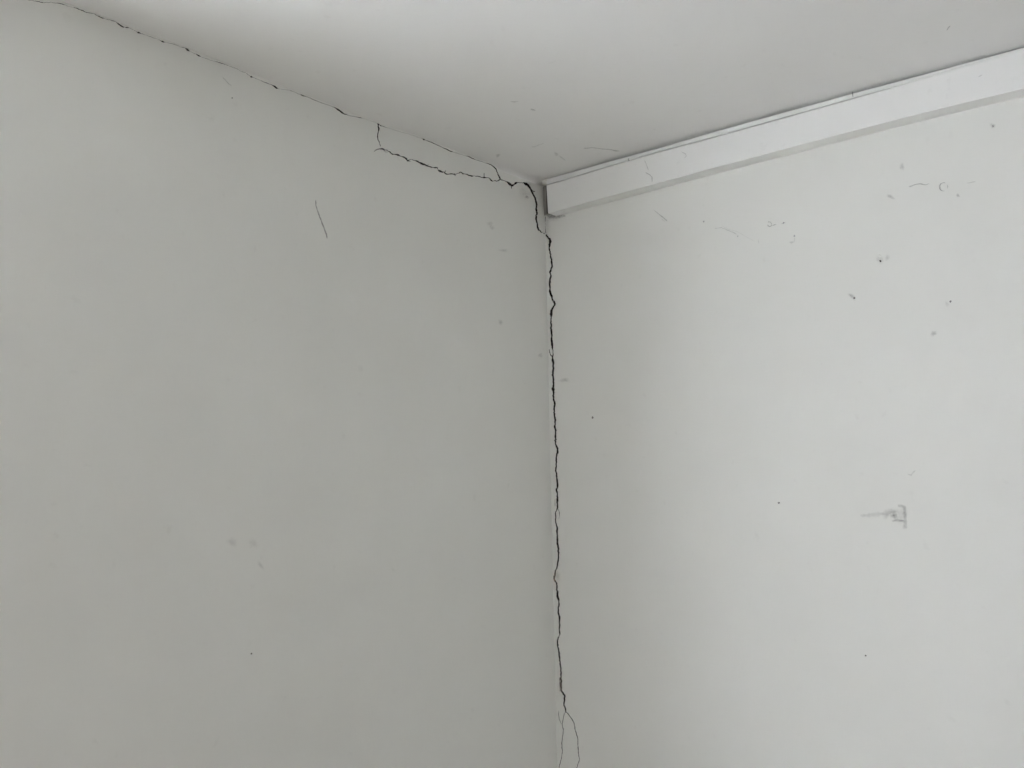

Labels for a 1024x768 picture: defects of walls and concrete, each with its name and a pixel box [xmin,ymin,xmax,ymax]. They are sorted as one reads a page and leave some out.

crack [30,0,580,767]